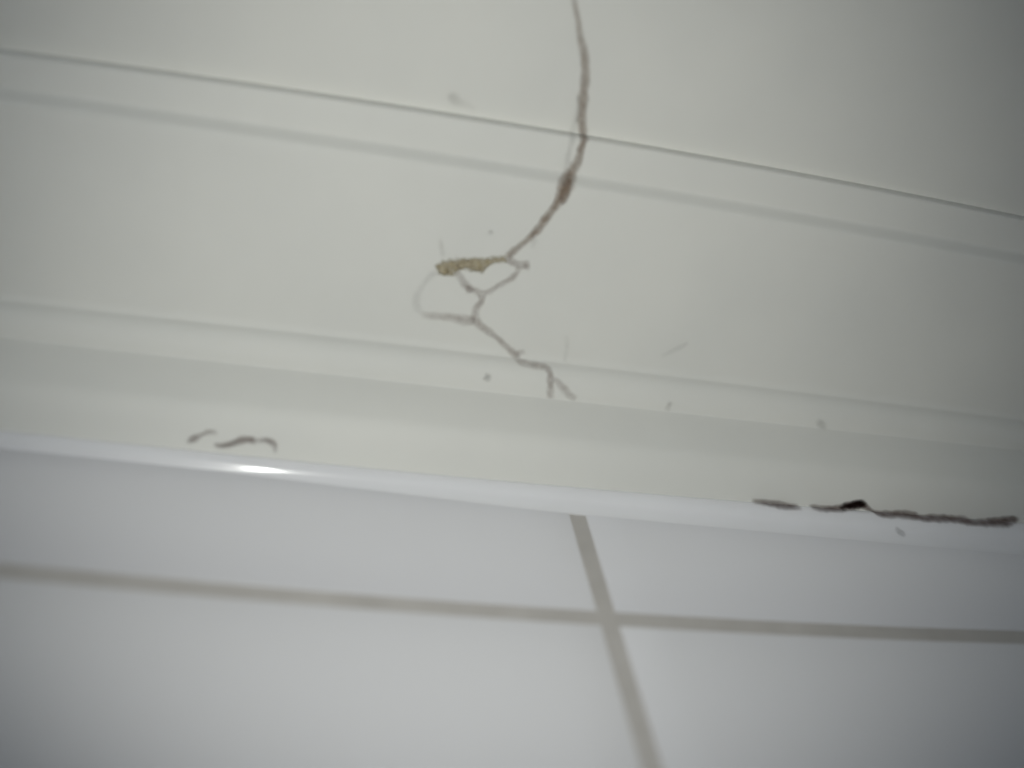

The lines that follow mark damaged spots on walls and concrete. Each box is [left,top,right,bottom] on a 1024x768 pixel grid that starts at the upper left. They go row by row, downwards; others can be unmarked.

crack [531,134,585,237]
crack [822,501,1016,525]